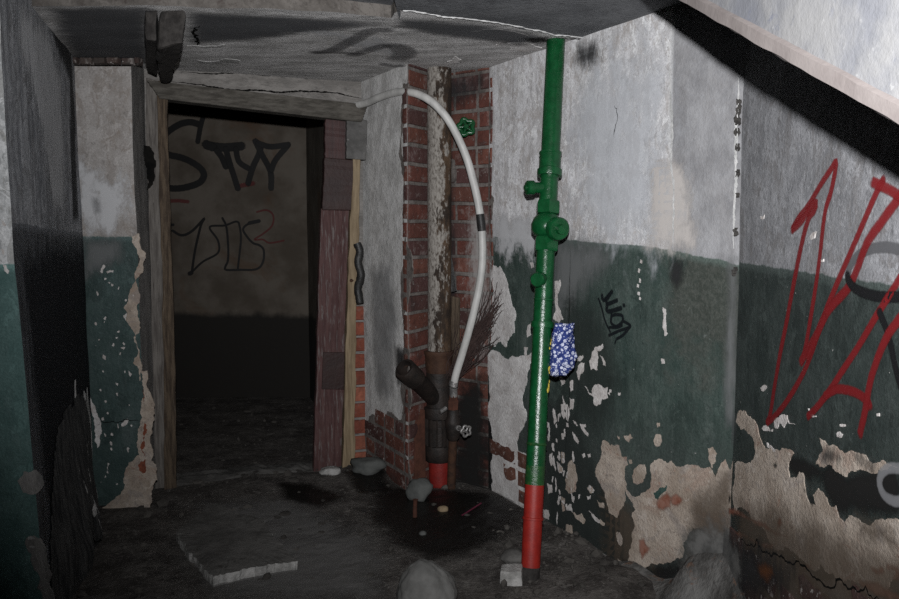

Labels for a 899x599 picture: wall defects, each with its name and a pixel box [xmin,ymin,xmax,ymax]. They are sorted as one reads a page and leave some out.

spalling [75,233,158,529]
flaking render [354,306,412,490]
flaking render [399,83,414,372]
peeling [487,78,531,508]
peeling [553,280,563,323]
spalling [543,344,899,576]
crack [741,539,878,599]